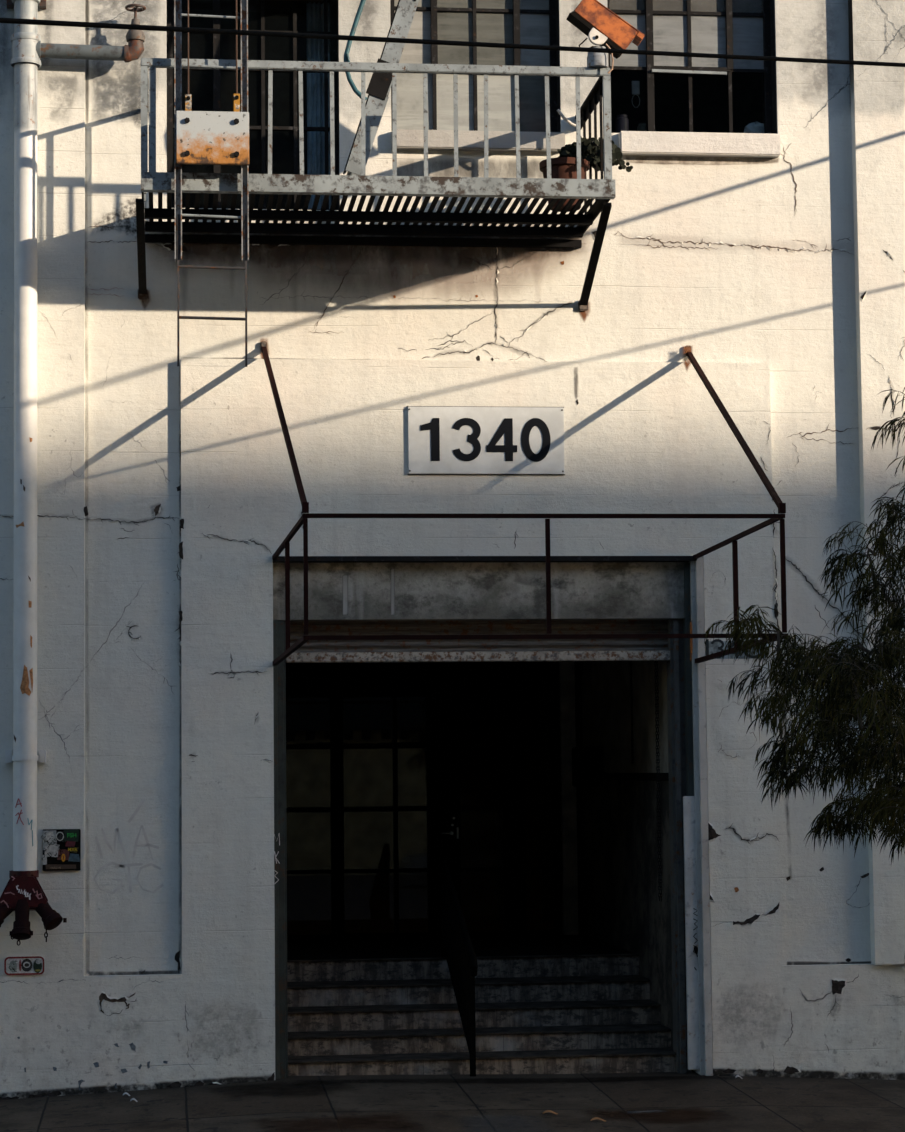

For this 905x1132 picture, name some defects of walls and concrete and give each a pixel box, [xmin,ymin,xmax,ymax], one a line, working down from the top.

crack [876,0,905,60]
crack [615,75,860,254]
crack [89,225,259,247]
crack [262,235,368,334]
crack [402,248,575,362]
crack [0,458,272,580]
crack [761,337,905,643]
crack [39,586,181,757]
crack [726,825,779,844]
spalling [97,991,137,1016]
spalling [830,978,847,995]